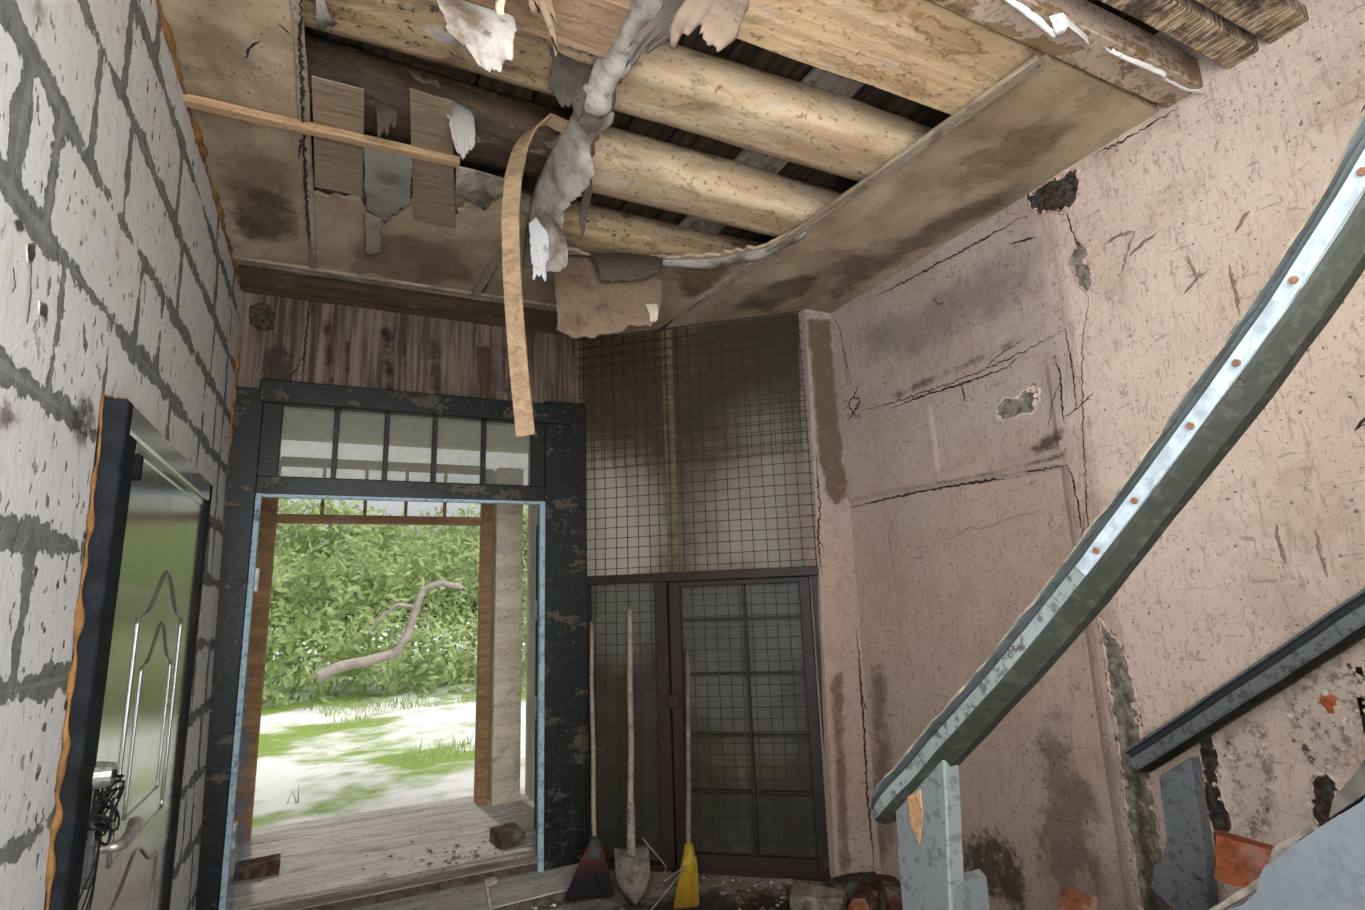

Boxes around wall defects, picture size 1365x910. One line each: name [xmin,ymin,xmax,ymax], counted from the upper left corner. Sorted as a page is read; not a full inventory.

spalling [1025,166,1082,217]
crack [1067,214,1082,252]
spalling [995,385,1041,422]
crack [815,299,1093,576]
peeling [1198,663,1365,863]
spalling [1209,879,1258,910]